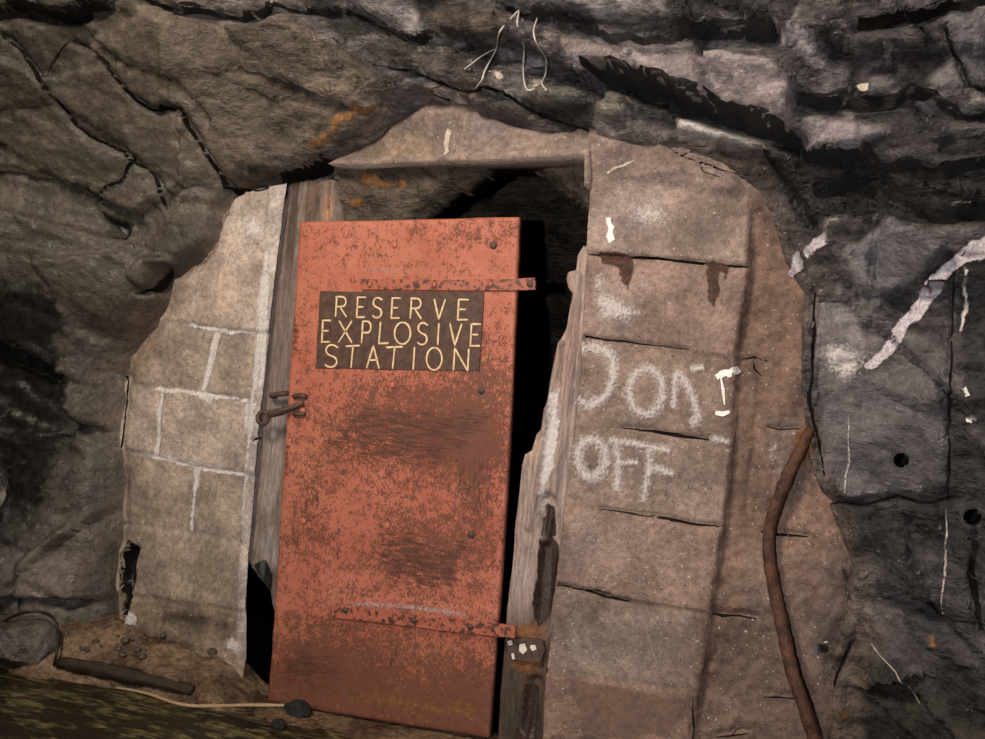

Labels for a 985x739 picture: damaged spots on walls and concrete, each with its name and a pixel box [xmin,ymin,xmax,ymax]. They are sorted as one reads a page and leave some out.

rust [598,252,633,289]
crack [627,256,748,268]
rust [705,261,730,306]
crack [585,335,689,350]
crack [623,428,709,441]
crack [601,509,719,527]
spalling [79,540,147,659]
crack [556,585,630,602]